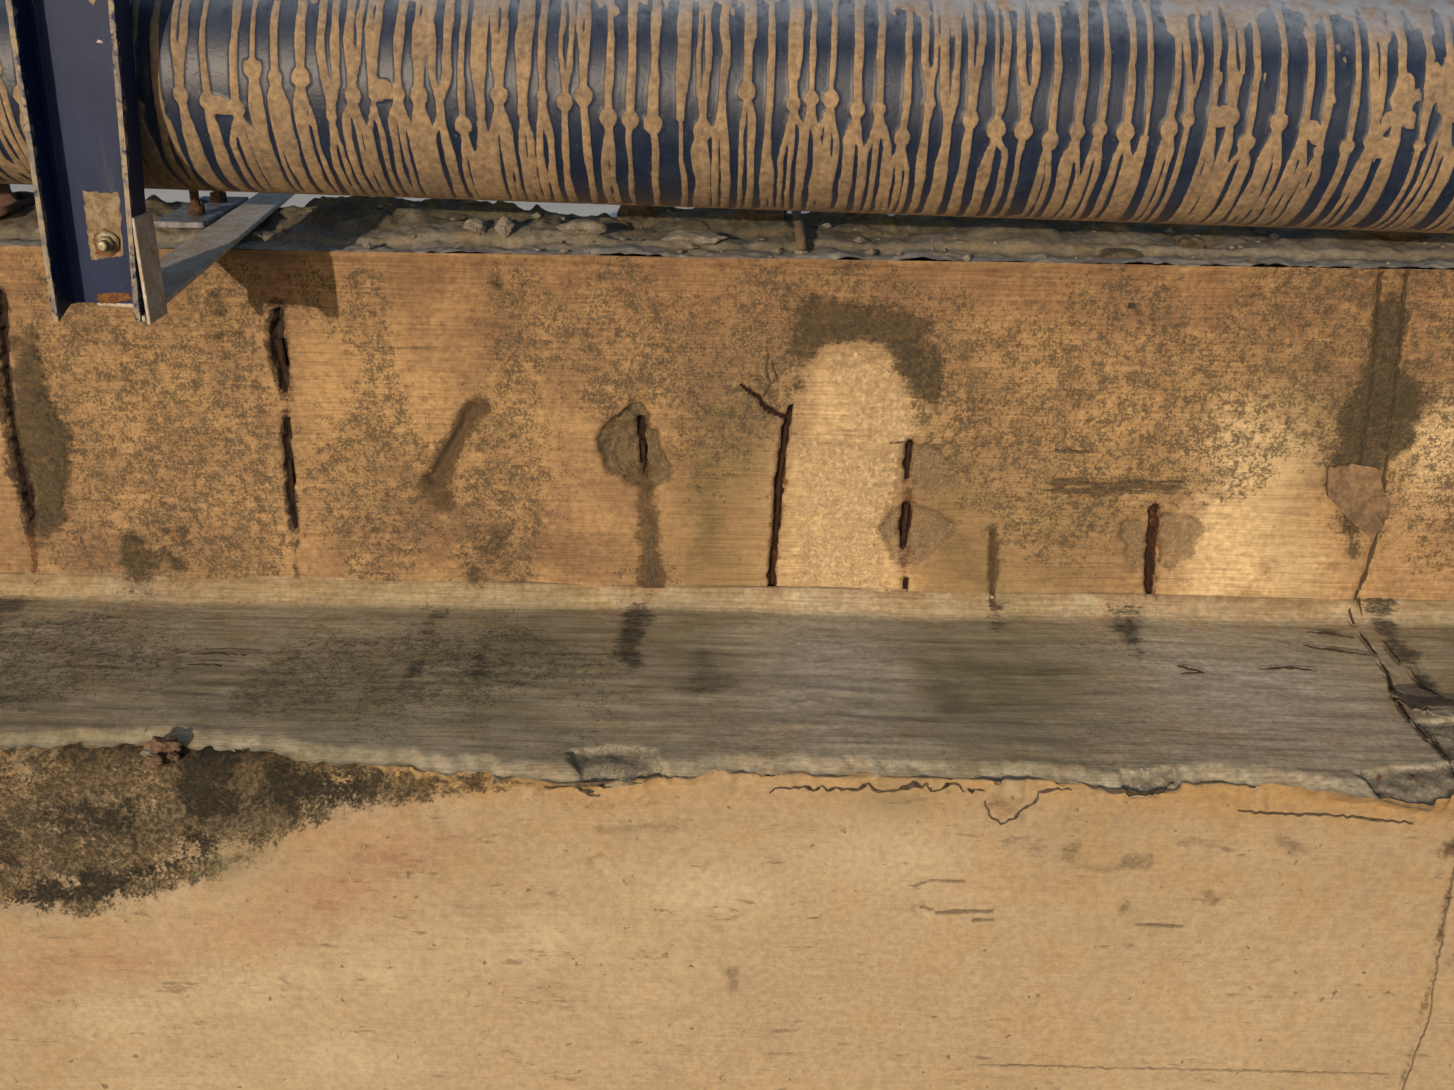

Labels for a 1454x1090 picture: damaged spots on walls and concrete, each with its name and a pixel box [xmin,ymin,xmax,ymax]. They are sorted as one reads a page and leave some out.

damp [8,322,81,550]
crack [739,353,787,419]
damp [783,286,946,404]
peeling [1326,463,1391,540]
spalling [1360,687,1454,806]